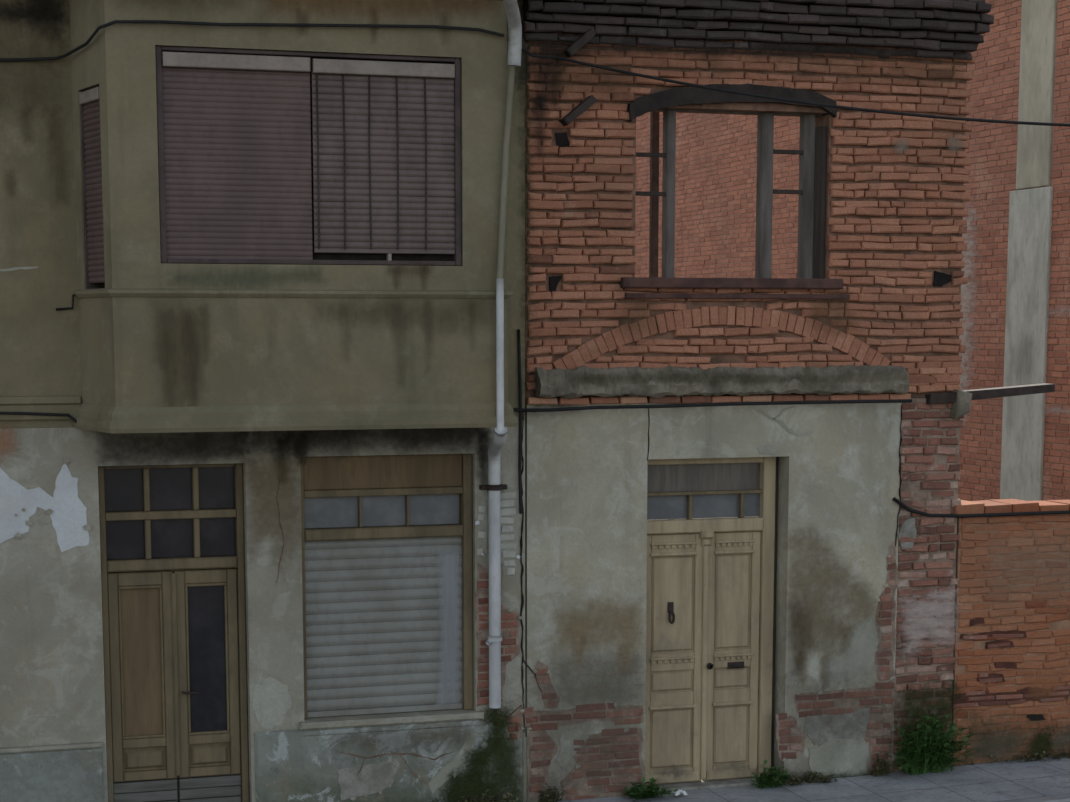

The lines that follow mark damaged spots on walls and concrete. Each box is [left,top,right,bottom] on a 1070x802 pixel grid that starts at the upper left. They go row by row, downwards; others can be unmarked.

peeling [0,458,91,552]
spalling [474,486,523,706]
peeling [338,761,398,801]
peeling [428,734,476,794]
spalling [508,661,646,802]
spalling [775,541,1027,773]
spalling [952,662,1070,709]